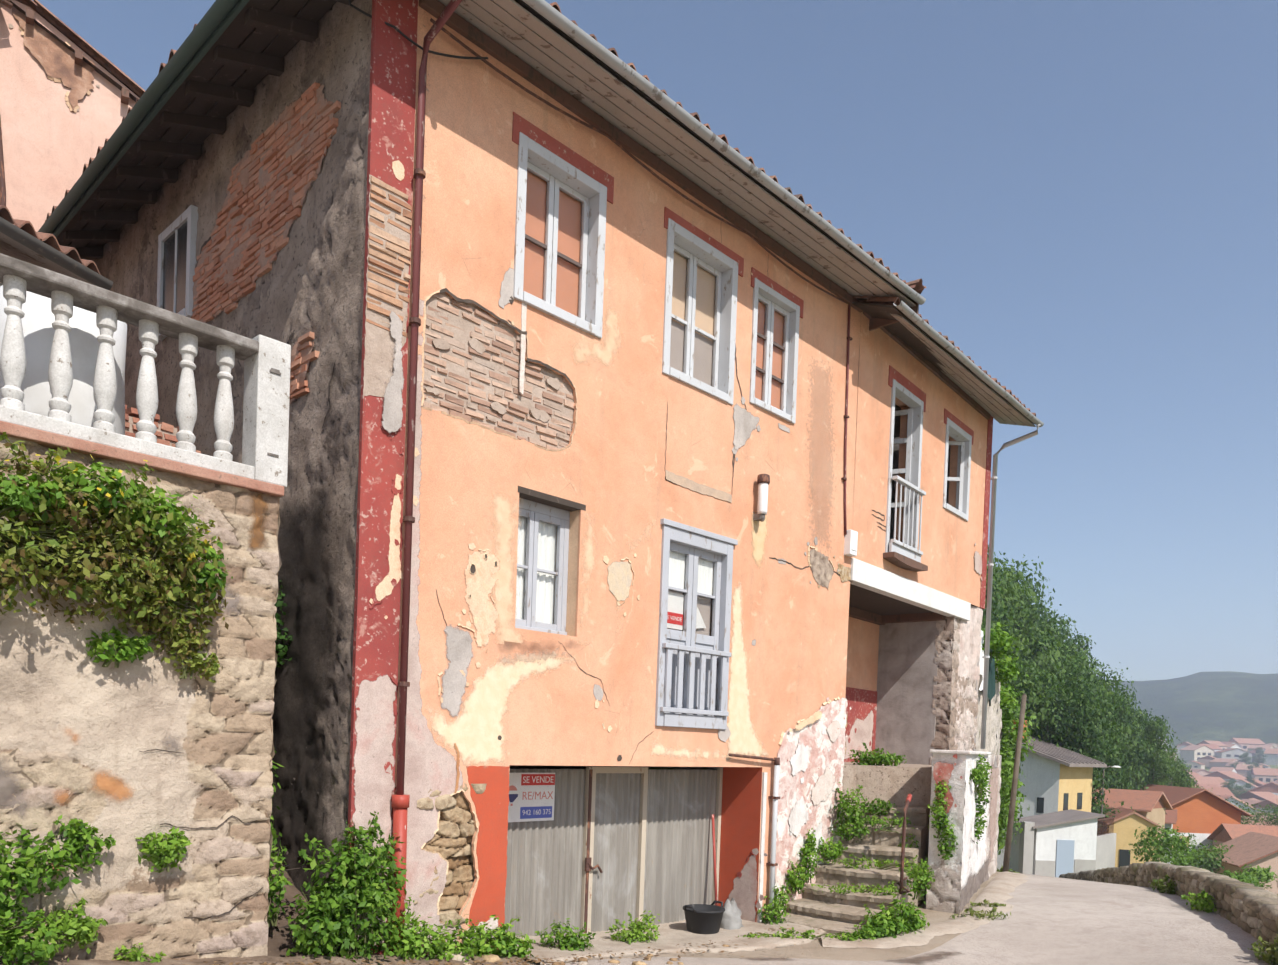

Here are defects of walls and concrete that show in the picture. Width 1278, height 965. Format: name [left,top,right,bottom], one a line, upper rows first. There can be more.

flaking render [191,82,341,323]
flaking render [289,331,320,404]
flaking render [574,310,621,364]
flaking render [732,396,761,461]
flaking render [351,160,578,946]
flaking render [603,553,640,617]
crack [769,557,851,582]
damp [270,501,333,904]
flaking render [651,586,877,922]
peeling [933,754,963,814]